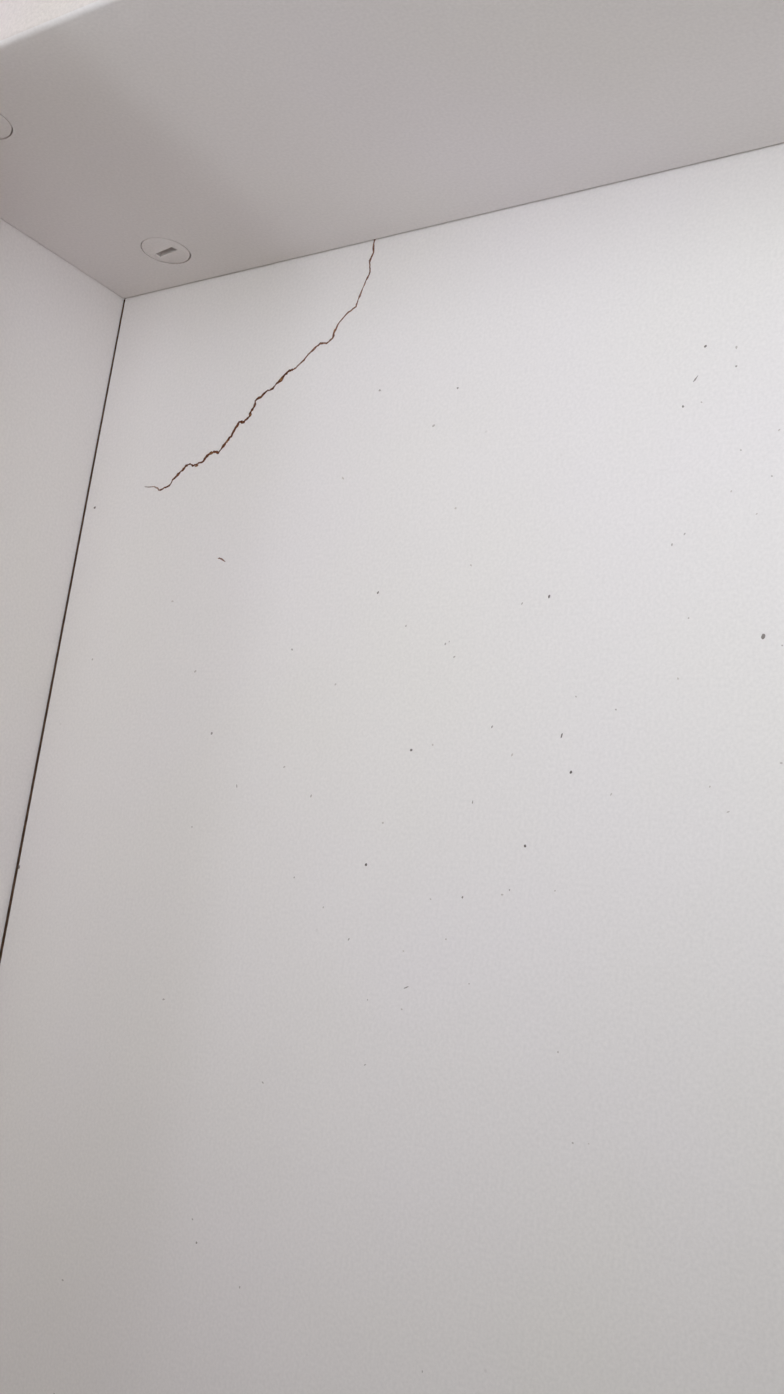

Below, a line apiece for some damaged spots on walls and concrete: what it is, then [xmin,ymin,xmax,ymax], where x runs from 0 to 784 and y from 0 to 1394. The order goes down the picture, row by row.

crack [145,239,376,491]